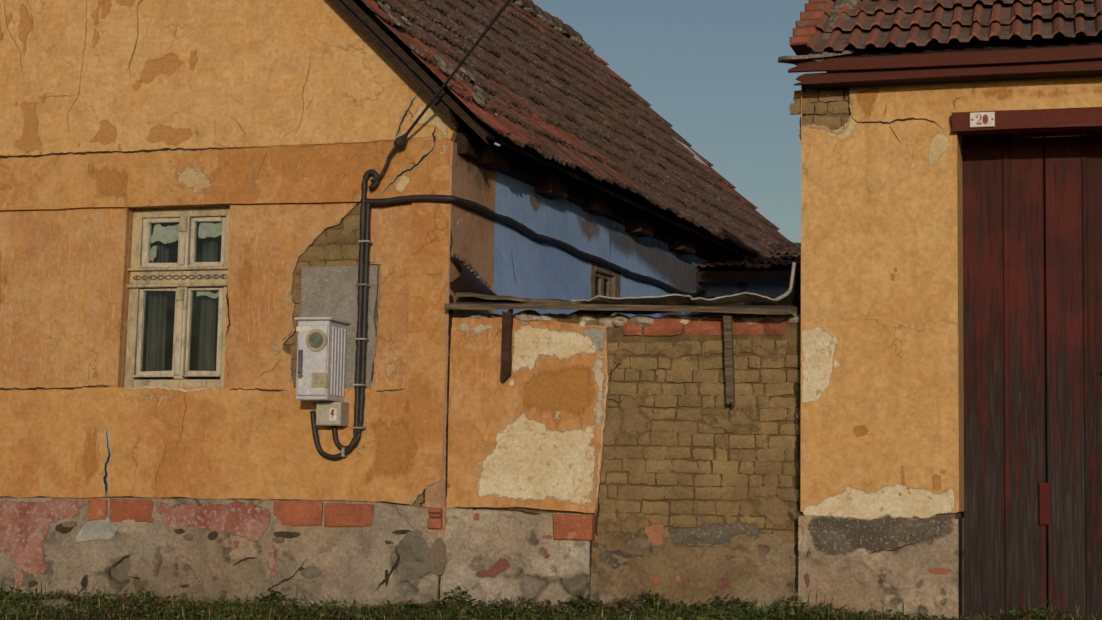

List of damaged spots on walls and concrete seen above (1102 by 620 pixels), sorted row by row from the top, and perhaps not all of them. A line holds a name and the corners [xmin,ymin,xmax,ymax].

peeling [133,49,197,91]
peeling [14,94,46,154]
peeling [146,122,191,146]
crack [0,0,437,201]
crack [852,96,964,142]
peeling [169,162,214,194]
flaking render [272,202,382,388]
flaking render [801,327,840,403]
crack [101,426,112,497]
flaking render [385,319,608,587]
flaking render [803,466,955,520]
spalling [55,521,76,534]